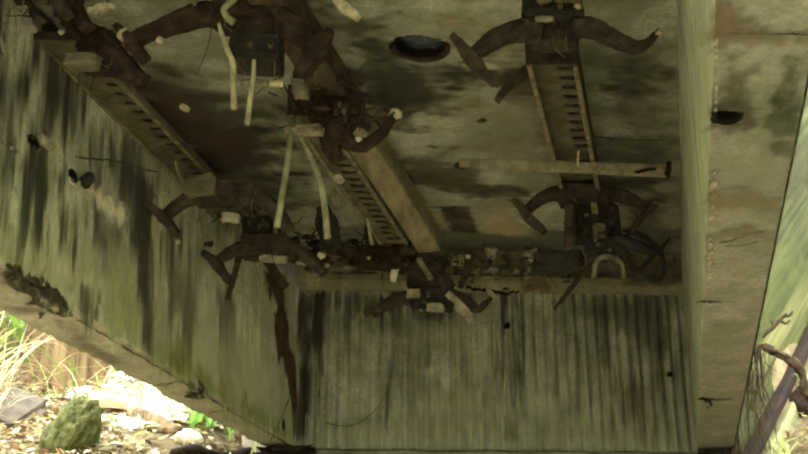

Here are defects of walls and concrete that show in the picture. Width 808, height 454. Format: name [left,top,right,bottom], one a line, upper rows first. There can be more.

water stain [18,42,40,101]
water stain [43,57,79,141]
water stain [134,65,304,196]
water stain [316,6,477,130]
water stain [3,147,47,278]
spalling [3,263,73,319]
water stain [61,137,158,360]
corrosion [265,272,297,436]
water stain [296,292,324,438]
water stain [401,158,528,236]